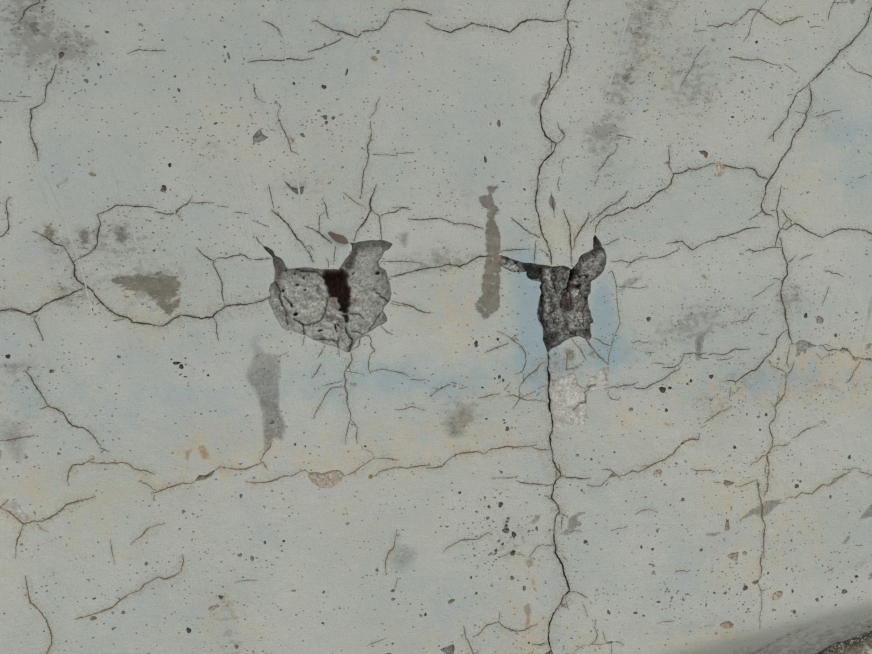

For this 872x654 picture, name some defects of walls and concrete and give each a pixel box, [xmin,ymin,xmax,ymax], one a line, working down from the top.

spalling [263,231,393,352]